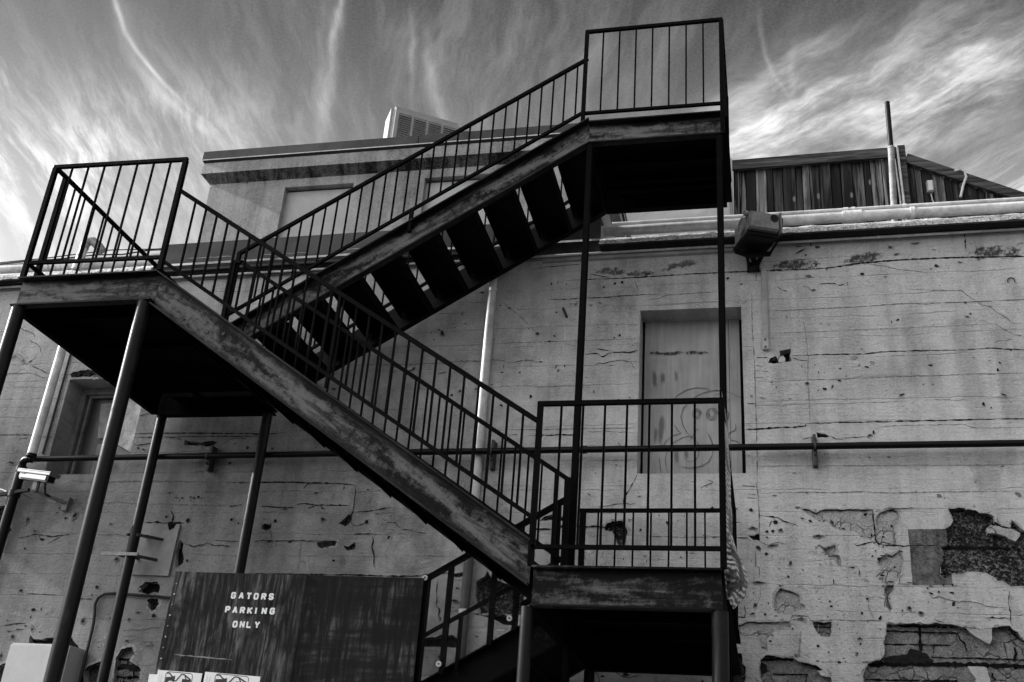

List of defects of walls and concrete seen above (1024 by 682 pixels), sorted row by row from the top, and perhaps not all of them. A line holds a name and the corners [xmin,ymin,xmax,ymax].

crack [536,234,1024,657]
spalling [80,640,153,682]
hole [127,581,164,622]
crack [35,480,459,622]
spalling [738,494,1024,682]